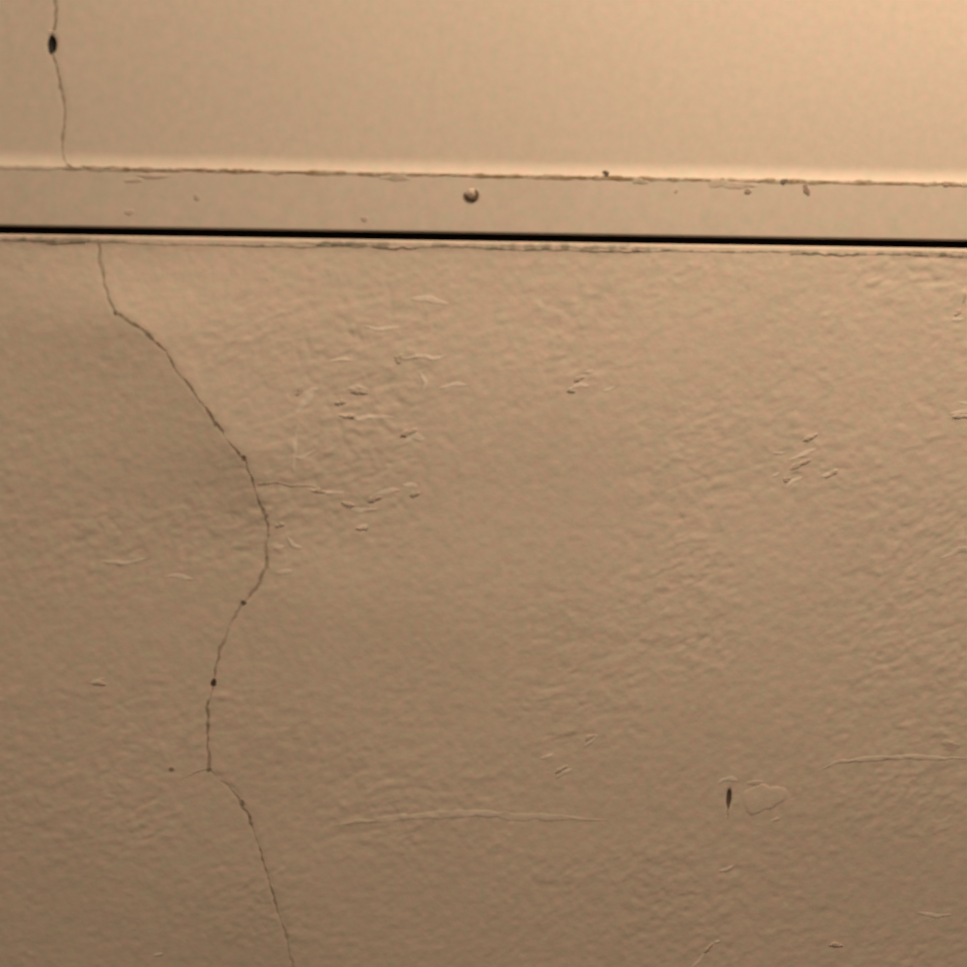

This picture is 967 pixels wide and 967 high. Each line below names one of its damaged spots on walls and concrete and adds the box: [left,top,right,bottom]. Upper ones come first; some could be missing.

crack [52,0,82,170]
crack [0,239,967,967]